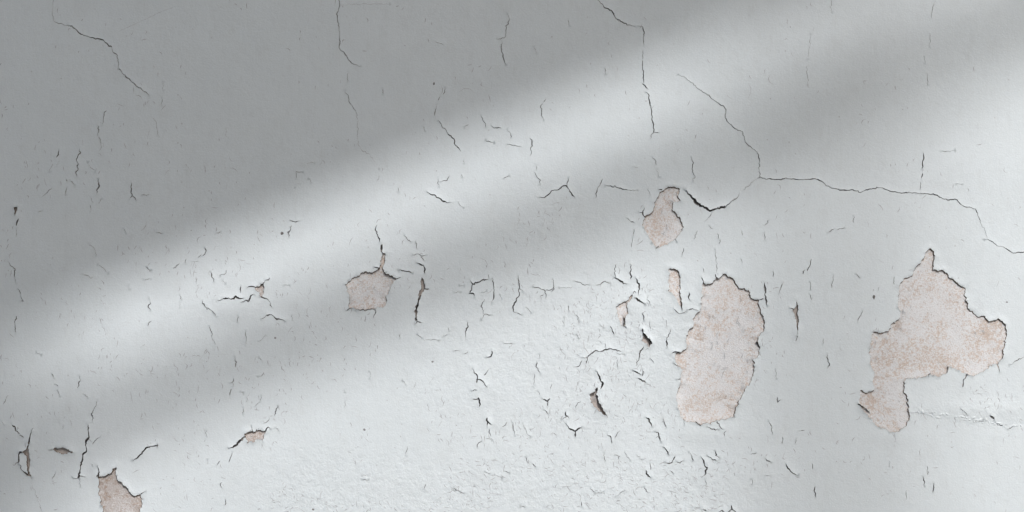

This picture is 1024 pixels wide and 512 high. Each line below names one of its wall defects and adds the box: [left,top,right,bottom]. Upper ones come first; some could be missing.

crack [2,353,98,502]
peeling [96,468,145,512]
crack [142,232,293,429]
peeling [230,427,269,448]
peeling [345,225,401,317]
crack [424,0,658,207]
crack [398,218,695,478]
crack [581,417,719,506]
peeling [640,187,684,249]
peeling [673,274,767,436]
crack [682,76,1024,272]
peeling [858,248,1007,432]